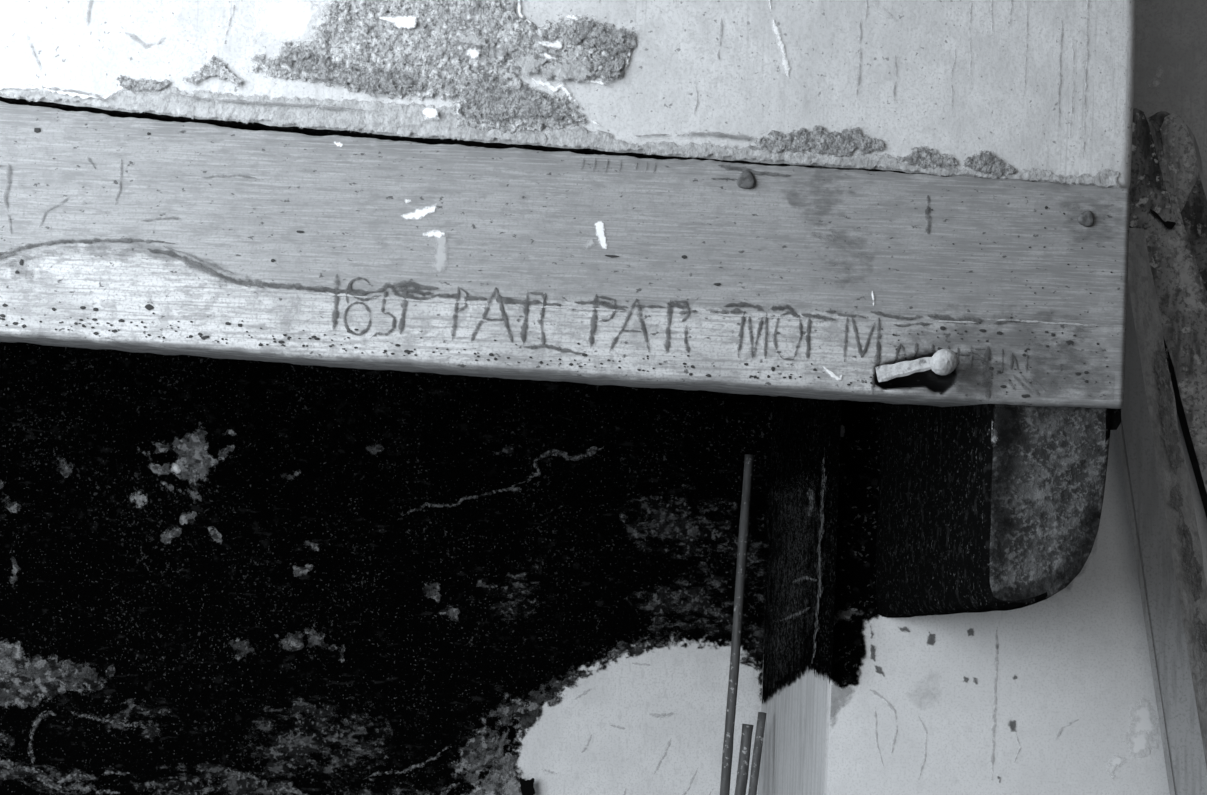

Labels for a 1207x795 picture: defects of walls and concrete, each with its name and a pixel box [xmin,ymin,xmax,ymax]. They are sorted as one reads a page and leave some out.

spalling [0,0,1120,188]
peeling [1133,0,1207,183]
peeling [137,440,202,544]
peeling [208,527,223,544]
peeling [293,541,321,577]
peeling [304,628,345,663]
peeling [423,582,460,623]
peeling [477,564,542,620]
peeling [601,571,765,669]
spalling [0,639,172,742]
peeling [130,763,295,795]
peeling [328,725,522,795]